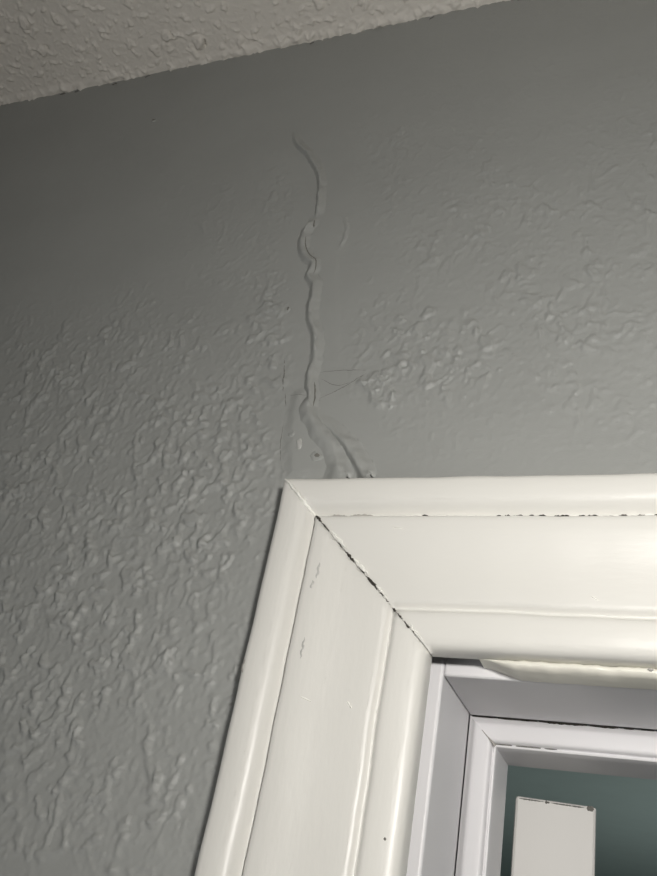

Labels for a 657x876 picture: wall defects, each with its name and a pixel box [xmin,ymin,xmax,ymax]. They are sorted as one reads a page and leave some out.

crack [280,125,424,642]